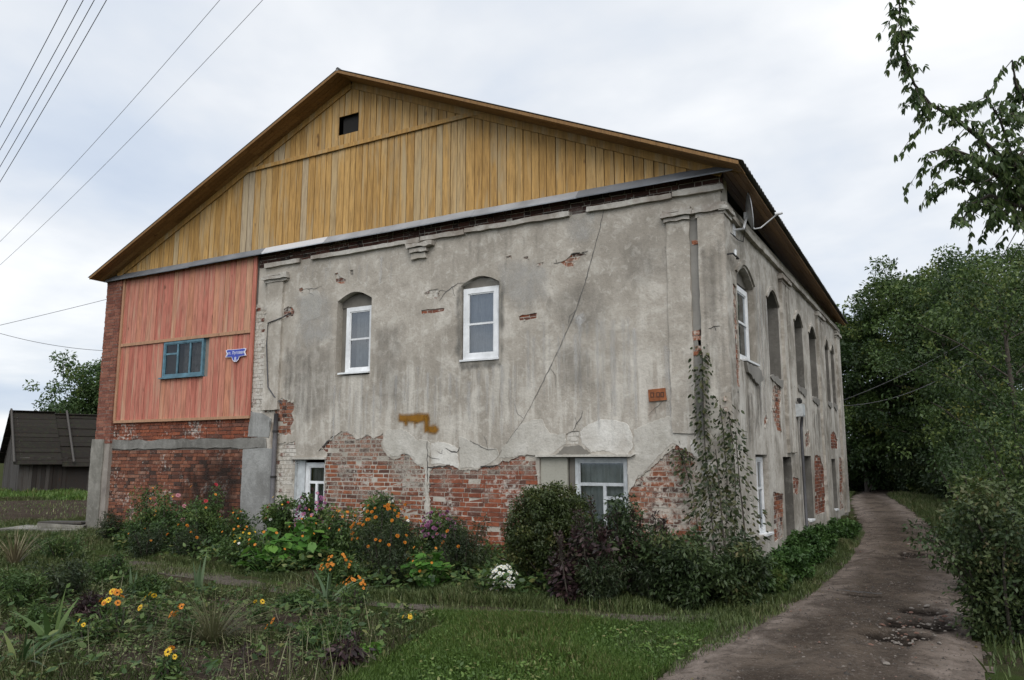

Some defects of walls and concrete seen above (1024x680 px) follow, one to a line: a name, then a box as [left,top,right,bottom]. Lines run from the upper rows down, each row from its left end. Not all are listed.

spalling [422,289,444,314]
spalling [561,252,584,267]
crack [427,210,604,489]
spalling [250,302,296,511]
spalling [764,384,781,432]
spalling [321,432,538,556]
spalling [627,445,704,549]
spalling [773,476,799,541]
spalling [805,431,825,515]
spalling [831,431,843,510]